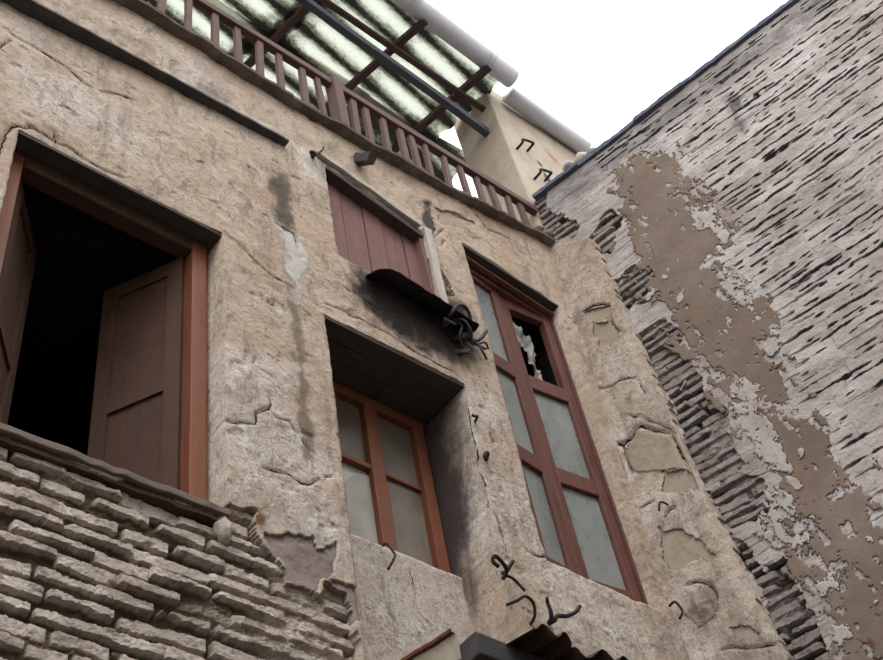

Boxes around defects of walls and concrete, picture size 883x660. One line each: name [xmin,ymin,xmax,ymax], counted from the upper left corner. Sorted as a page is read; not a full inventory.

crack [0,125,113,175]
spalling [534,196,580,240]
water stain [269,175,313,458]
crack [233,396,310,452]
peeling [585,141,883,660]
crack [267,469,331,486]
spalling [0,447,359,660]